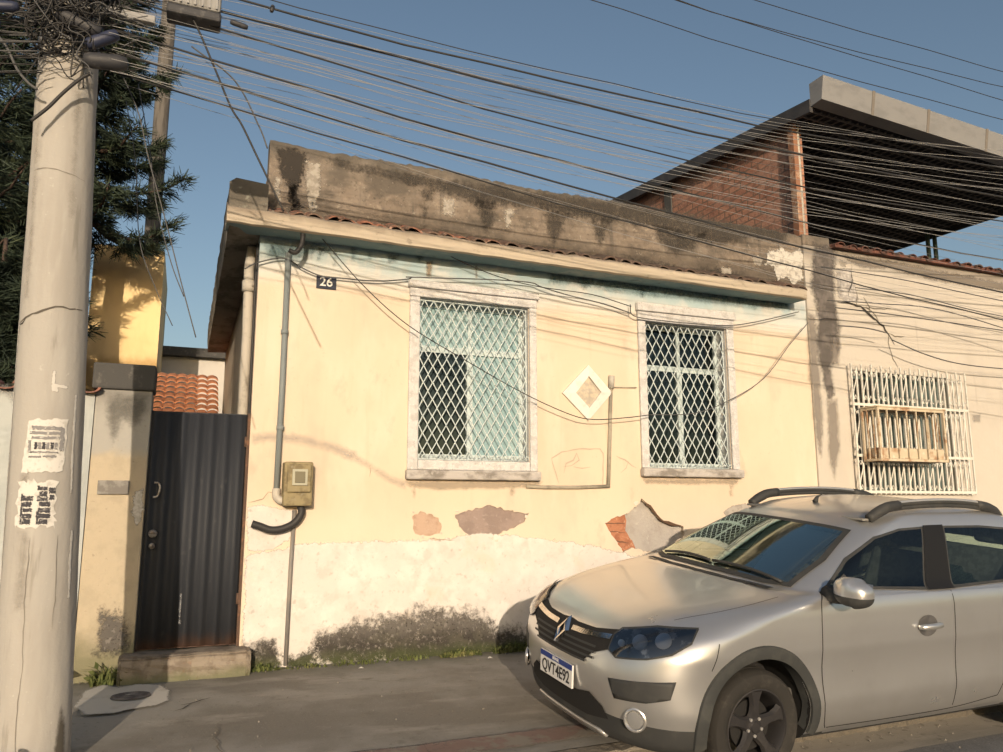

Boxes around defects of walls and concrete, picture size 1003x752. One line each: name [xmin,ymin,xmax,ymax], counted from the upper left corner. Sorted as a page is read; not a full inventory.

damp [276,147,306,212]
damp [336,158,786,252]
damp [269,244,324,257]
peeling [752,248,805,284]
crack [20,306,80,325]
damp [808,245,1003,468]
flaking render [724,504,750,516]
peeling [242,499,687,668]
damp [250,603,527,669]